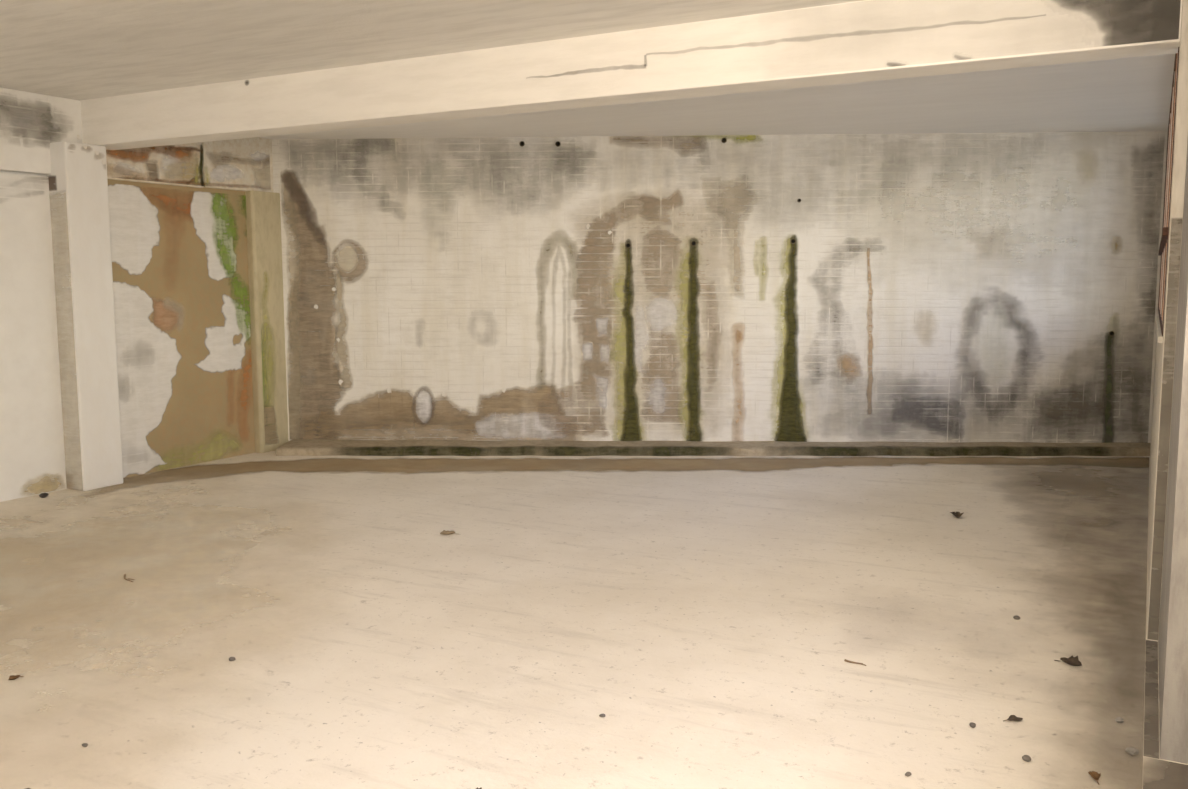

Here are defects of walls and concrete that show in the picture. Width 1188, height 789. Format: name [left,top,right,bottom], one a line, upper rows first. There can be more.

leakage [1063,0,1181,46]
peeling [190,191,237,281]
peeling [108,184,181,478]
peeling [195,295,251,373]
peeling [283,171,681,441]